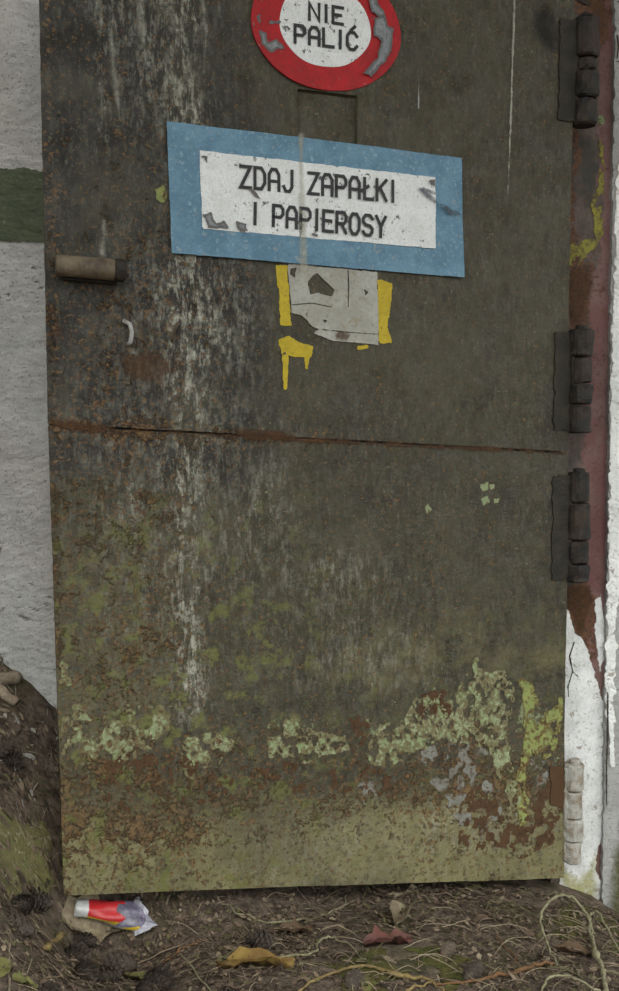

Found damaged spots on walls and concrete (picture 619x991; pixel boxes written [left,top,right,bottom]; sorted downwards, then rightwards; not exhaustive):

peeling [203,212,247,232]
rust [208,429,514,452]
peeling [367,140,619,900]
rust [567,586,592,631]
rust [417,689,452,719]
peeling [267,715,350,764]
rust [102,754,234,813]
peeling [357,780,378,805]
rust [458,781,560,859]